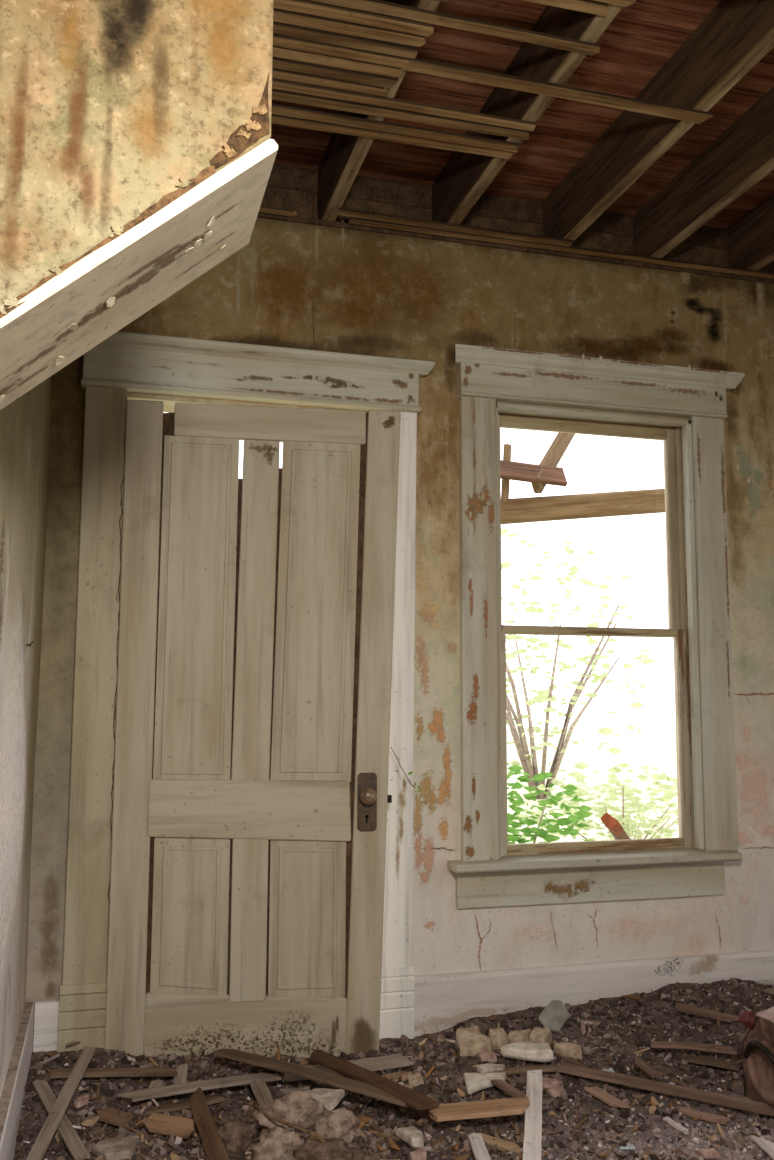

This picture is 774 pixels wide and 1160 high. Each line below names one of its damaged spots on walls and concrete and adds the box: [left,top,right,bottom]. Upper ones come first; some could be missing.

damp [156,54,166,98]
damp [567,272,733,361]
peeling [230,373,415,428]
peeling [495,372,722,401]
damp [700,359,727,371]
peeling [464,486,494,528]
peeling [466,675,480,724]
crack [735,692,774,705]
peeling [413,710,452,884]
peeling [463,778,481,859]
peeling [545,879,594,902]
crack [475,915,491,970]